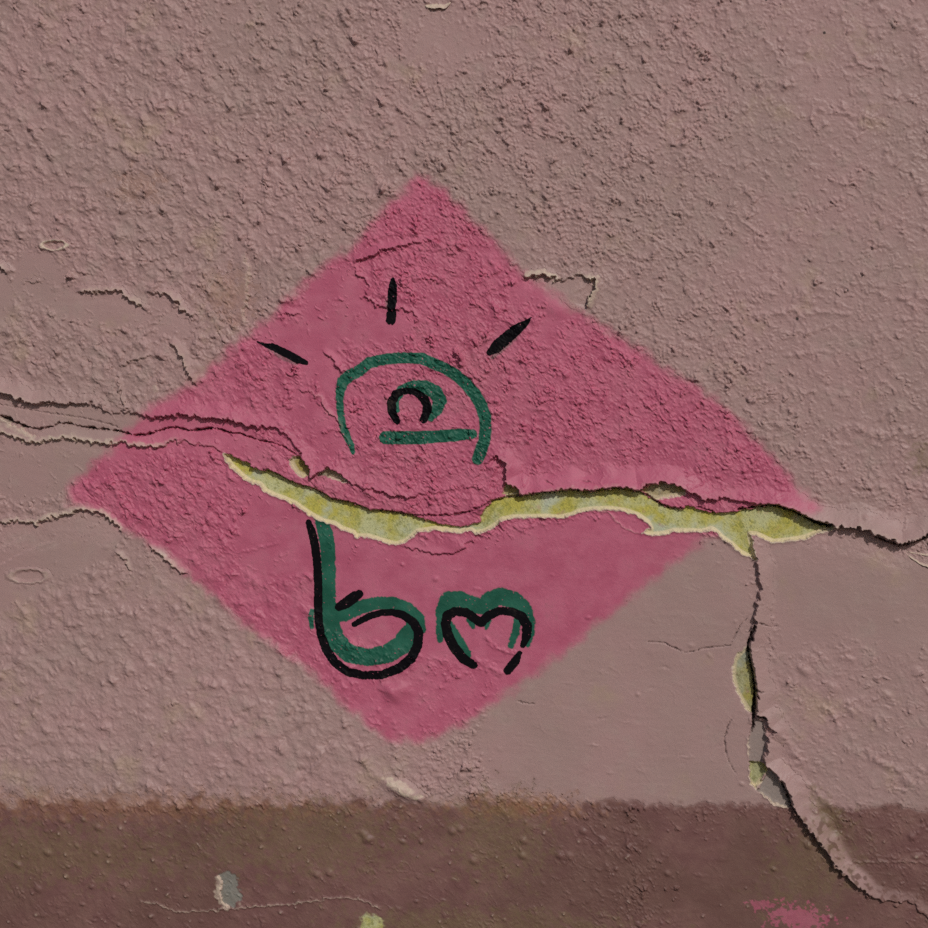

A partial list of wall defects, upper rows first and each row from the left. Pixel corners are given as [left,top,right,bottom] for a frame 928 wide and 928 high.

peeling [76,284,201,318]
peeling [522,268,601,310]
crack [0,377,928,919]